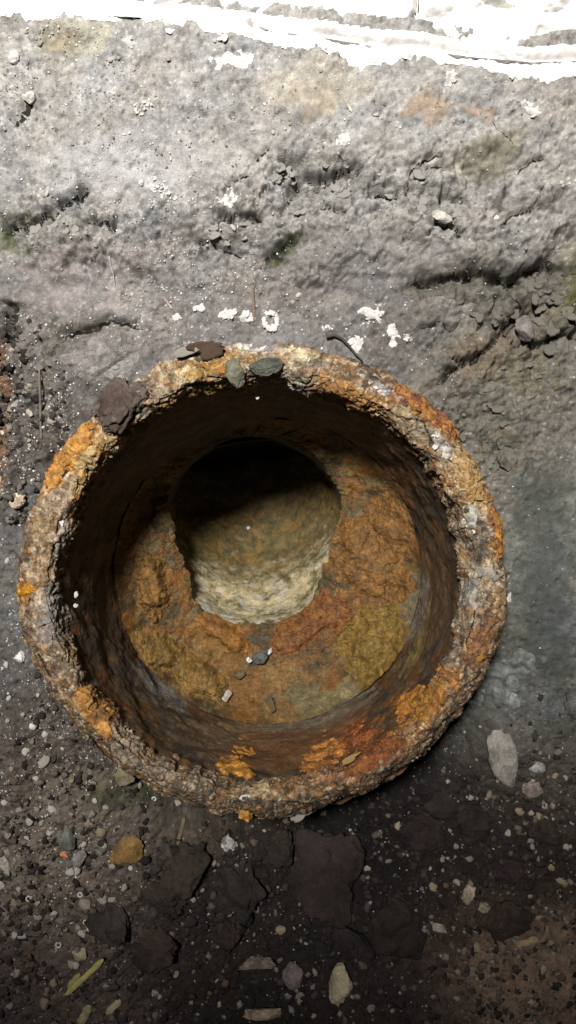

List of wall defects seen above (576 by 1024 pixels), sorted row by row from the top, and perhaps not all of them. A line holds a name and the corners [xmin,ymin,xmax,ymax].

efflorescence [218,308,280,332]
efflorescence [347,304,413,354]
rust [147,341,241,416]
rust [319,374,377,418]
rust [43,421,117,511]
rust [395,380,506,558]
rust [16,581,36,615]
rust [188,488,419,658]
rust [73,678,117,739]
rust [298,606,500,794]
rust [215,737,256,779]
rust [290,806,317,823]